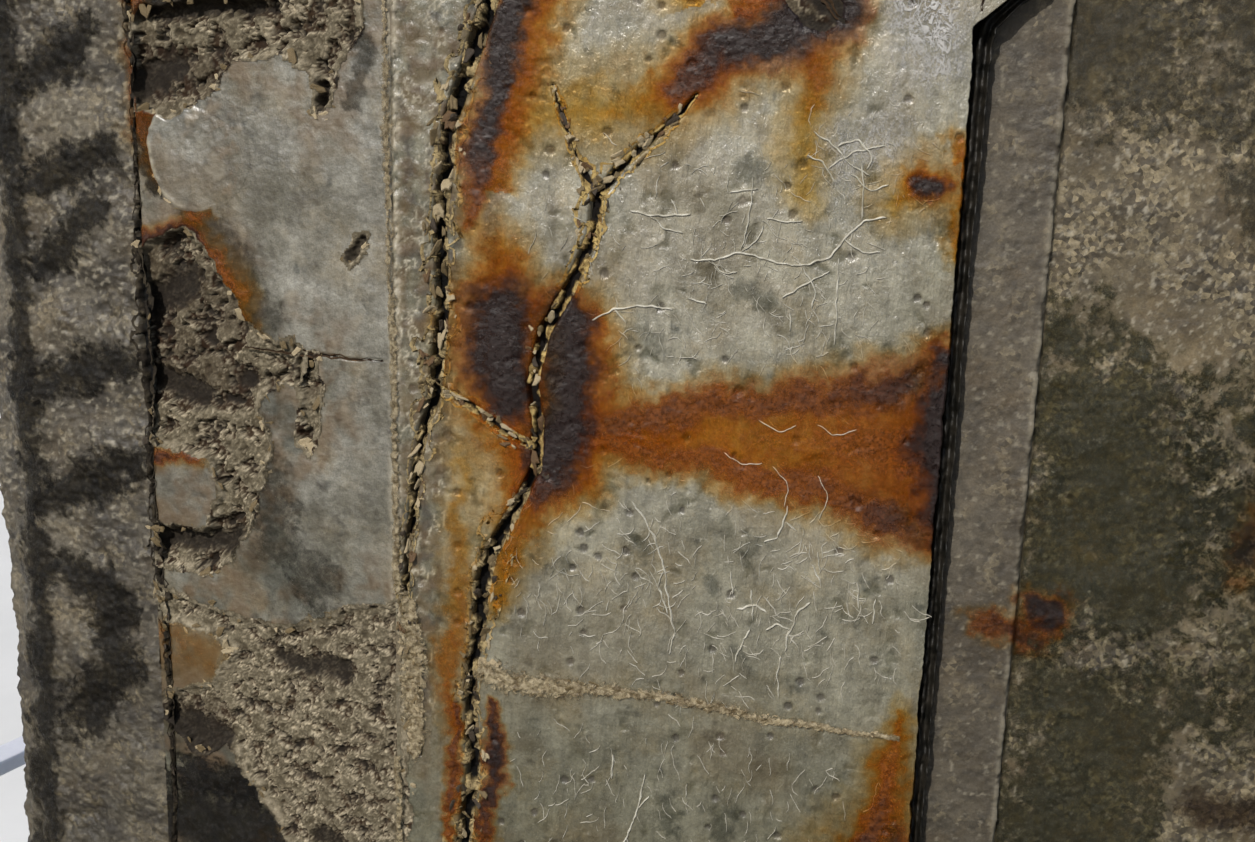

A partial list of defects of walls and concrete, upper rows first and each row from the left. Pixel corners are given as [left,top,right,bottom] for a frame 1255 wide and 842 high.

spalling [127,0,365,120]
rust [461,0,541,226]
rust [662,0,863,104]
rust [911,176,944,197]
damp [1066,0,1255,238]
spalling [131,220,416,842]
crack [245,346,383,362]
crack [394,0,943,842]
rust [466,255,951,551]
damp [995,286,1255,842]
rust [443,702,463,842]
rust [474,698,505,842]